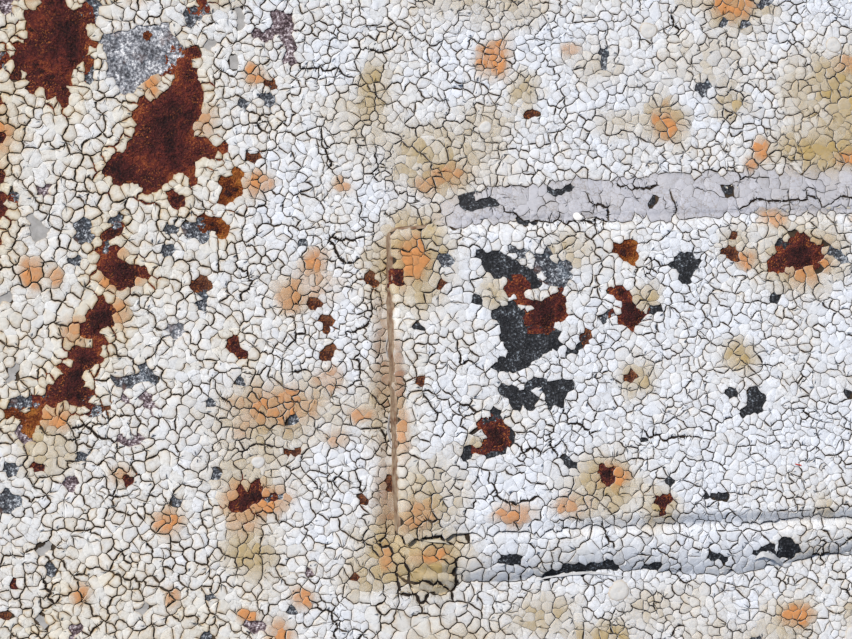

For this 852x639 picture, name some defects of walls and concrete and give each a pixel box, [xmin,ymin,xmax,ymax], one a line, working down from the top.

crack [0,0,42,57]
corrosion [0,0,107,118]
crack [66,0,85,10]
peeling [80,0,210,97]
corrosion [91,39,274,246]
corrosion [1,221,161,438]
peeling [474,245,579,293]
peeling [459,300,594,464]
corrosion [503,274,570,335]
crack [389,201,852,547]
peeling [724,386,767,423]
crack [392,572,412,594]